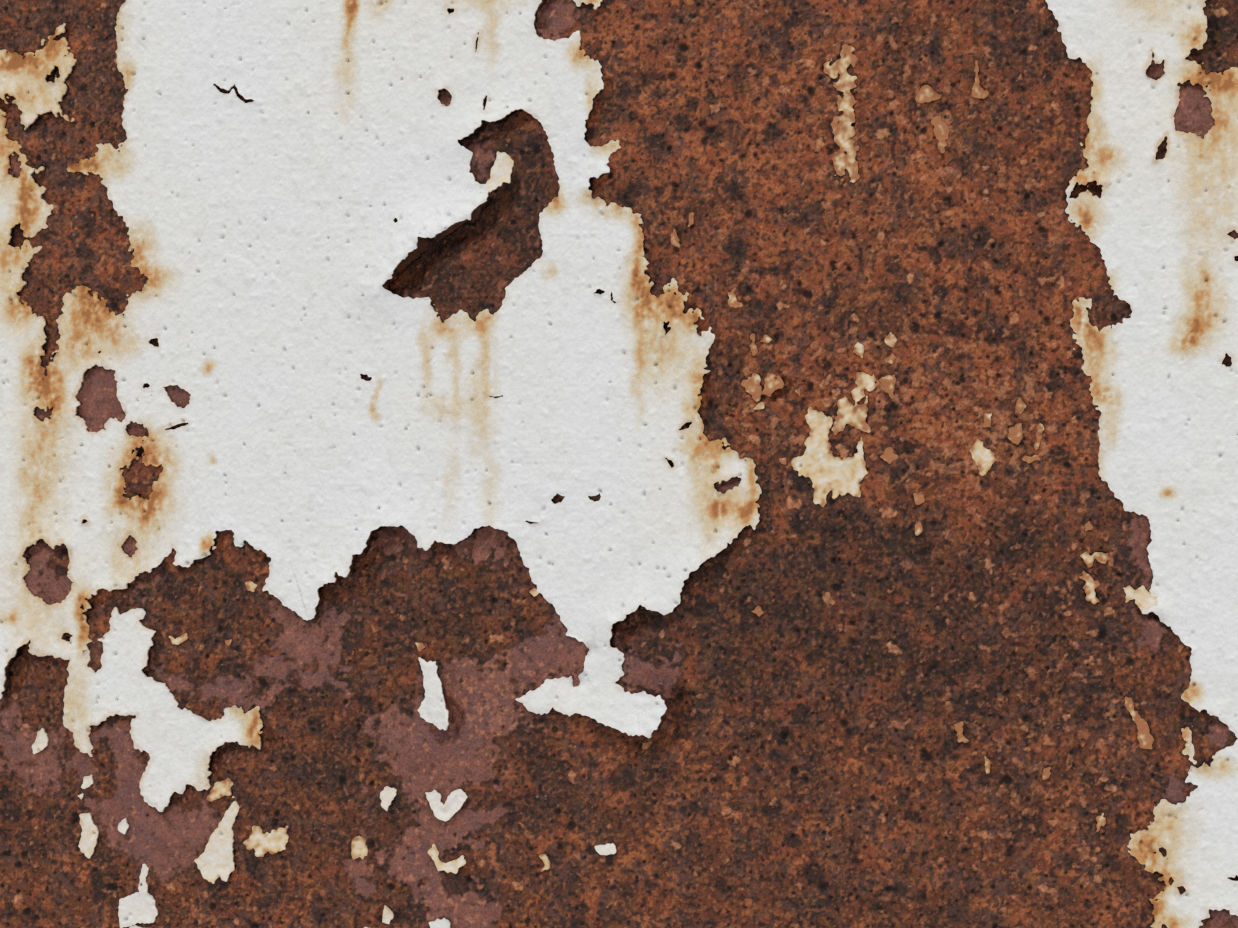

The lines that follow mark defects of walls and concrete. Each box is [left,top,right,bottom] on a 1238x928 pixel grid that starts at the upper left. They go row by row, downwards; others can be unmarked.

peeling [46,66,67,83]
peeling [8,151,22,178]
peeling [8,223,29,249]
corrosion [0,0,173,538]
corrosion [530,0,1238,928]
peeling [0,503,678,928]
peeling [1199,909,1238,928]